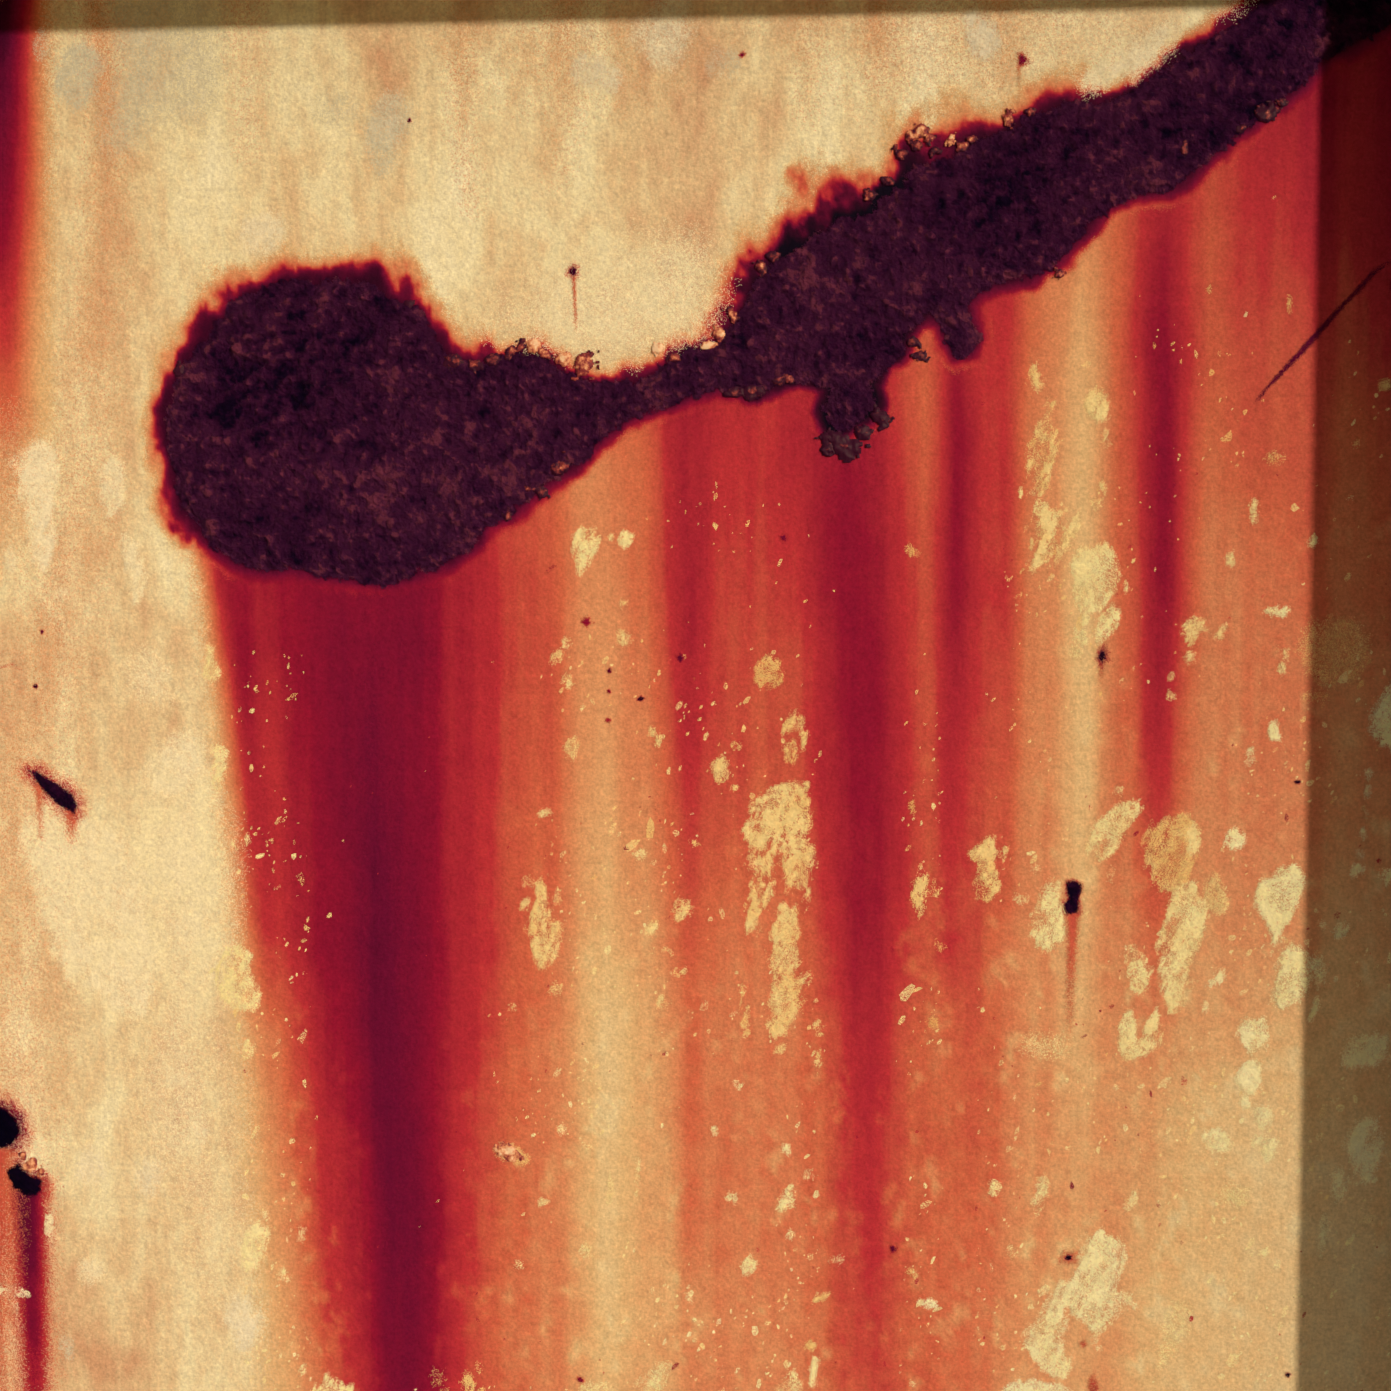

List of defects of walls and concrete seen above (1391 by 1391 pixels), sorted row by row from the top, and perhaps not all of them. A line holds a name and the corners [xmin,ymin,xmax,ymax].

rust [564,261,581,332]
peeling [710,708,826,1068]
peeling [1083,786,1231,1062]
peeling [987,1179,1002,1197]
peeling [1030,1175,1050,1216]
peeling [1002,1225,1139,1391]
peeling [298,1363,355,1391]
peeling [428,1362,486,1391]